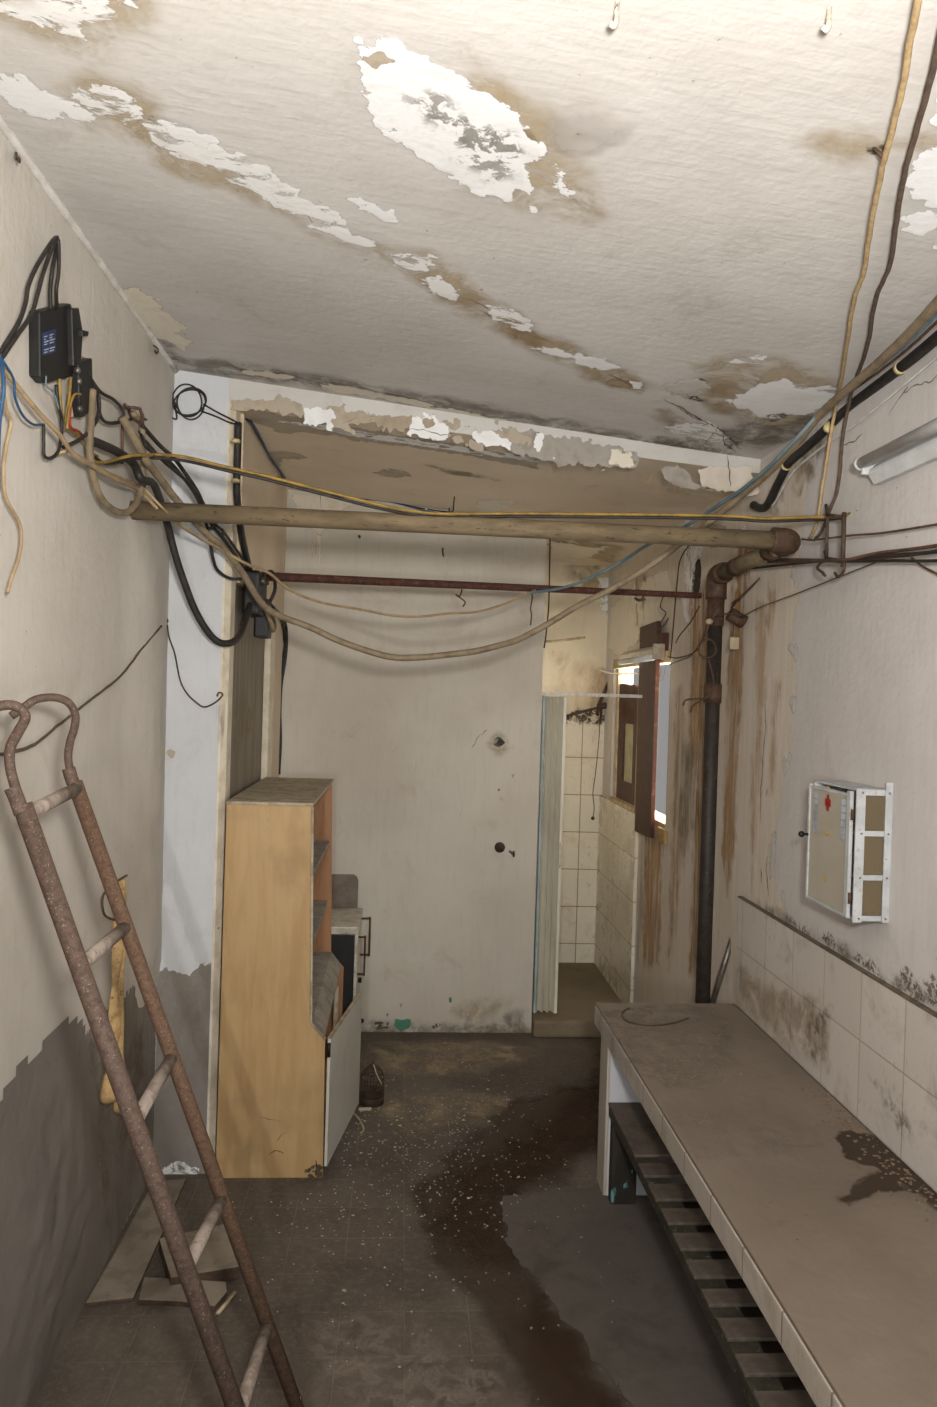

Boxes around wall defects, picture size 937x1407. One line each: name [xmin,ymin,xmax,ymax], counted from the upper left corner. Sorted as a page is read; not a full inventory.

peeling [0,0,139,41]
peeling [0,72,399,248]
peeling [352,35,576,213]
peeling [899,147,937,251]
leakage [387,253,563,351]
leakage [175,359,547,426]
peeling [231,394,639,472]
peeling [725,378,837,422]
corrosion [723,573,746,879]
leakage [898,967,937,1005]
leakage [835,1131,937,1209]
leakage [414,1085,619,1407]